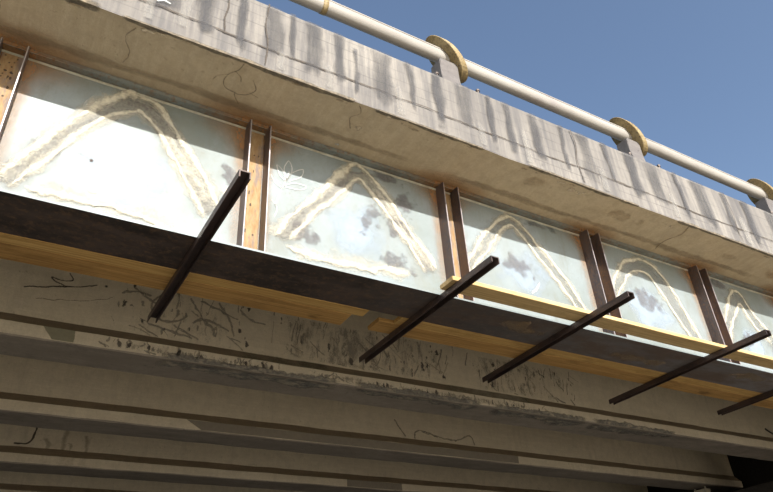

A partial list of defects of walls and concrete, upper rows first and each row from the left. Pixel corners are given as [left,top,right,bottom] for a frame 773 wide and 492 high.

leakage [201,0,213,31]
leakage [237,0,248,45]
corrosion [0,31,48,124]
leakage [405,61,415,104]
leakage [432,73,444,120]
crack [143,0,772,249]
leakage [486,95,497,139]
leakage [504,103,516,148]
leakage [530,114,545,156]
spalling [99,306,674,437]
crack [14,428,38,444]